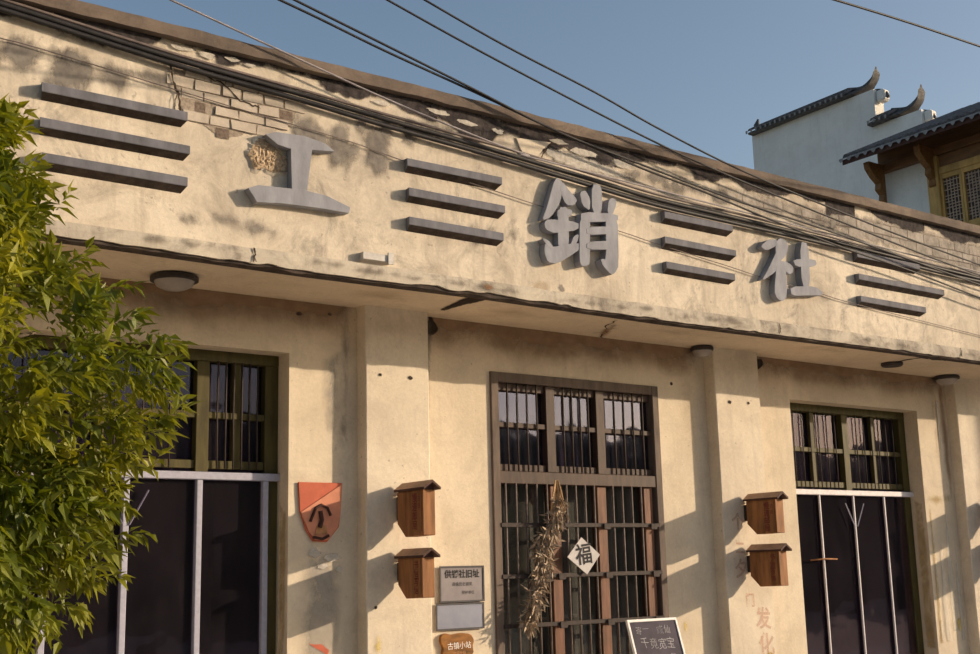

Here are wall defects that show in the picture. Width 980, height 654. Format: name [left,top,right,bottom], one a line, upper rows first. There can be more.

peeling [167,44,306,178]
peeling [428,108,478,126]
peeling [515,138,634,178]